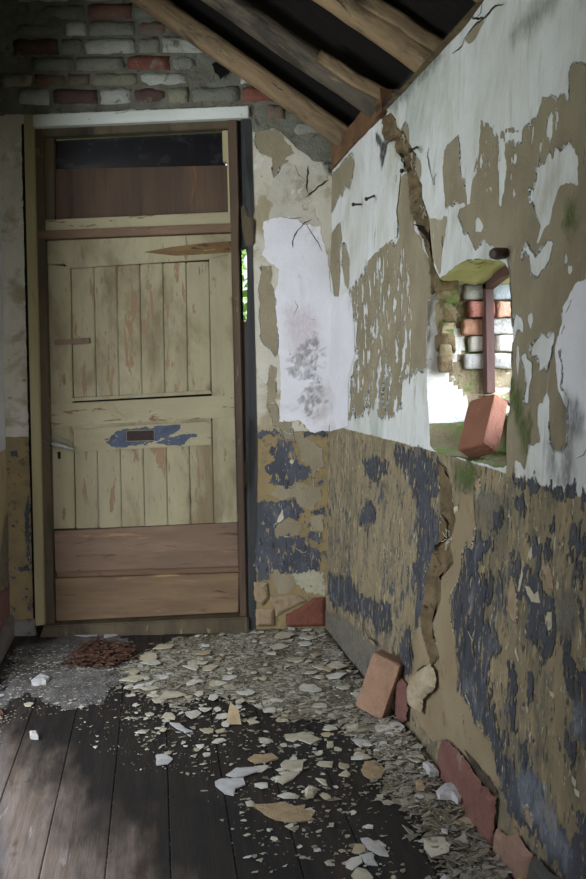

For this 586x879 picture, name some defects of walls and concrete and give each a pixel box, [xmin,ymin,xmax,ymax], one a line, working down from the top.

crack [453,4,504,53]
crack [286,217,322,250]
crack [296,168,328,197]
crack [382,113,443,295]
peeling [253,61,586,879]
crack [409,464,456,672]